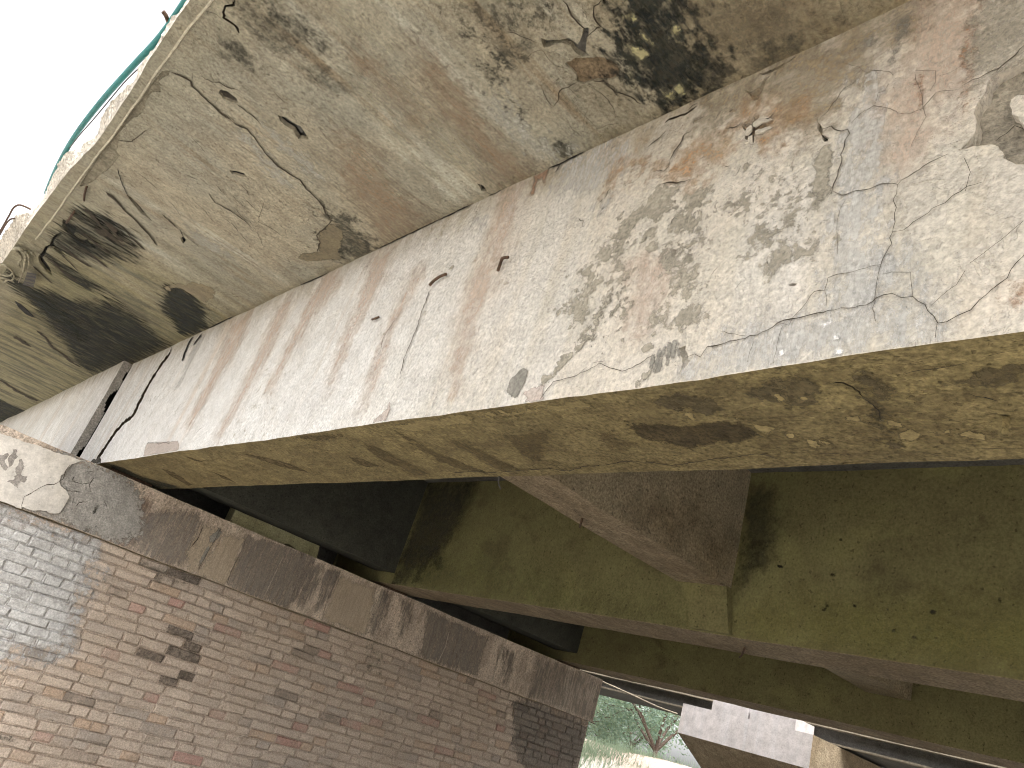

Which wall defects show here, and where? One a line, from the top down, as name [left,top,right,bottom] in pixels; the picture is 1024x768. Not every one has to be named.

spalling [541,1,620,84]
mould [590,0,736,118]
spalling [960,0,1024,165]
crack [33,72,332,285]
crack [688,47,1024,420]
spalling [0,449,27,488]
crack [0,380,38,401]
damp [5,253,216,384]
crack [13,317,232,507]
crack [540,354,655,399]
damp [137,436,514,636]